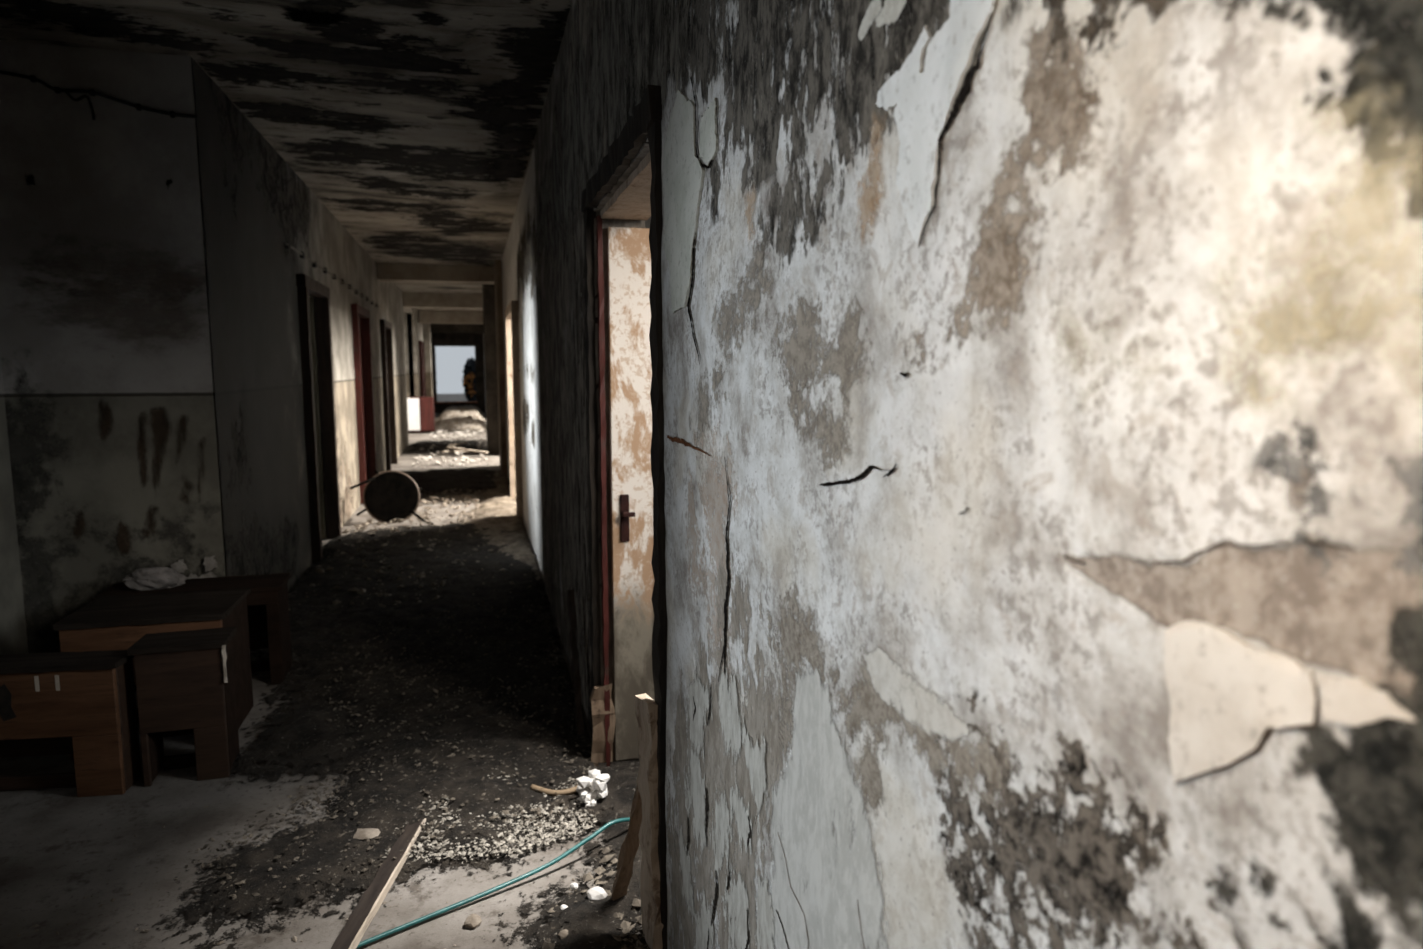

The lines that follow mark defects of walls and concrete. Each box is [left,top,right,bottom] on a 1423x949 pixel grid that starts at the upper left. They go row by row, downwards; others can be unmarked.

damp [0,0,571,267]
crack [690,77,718,169]
peeling [858,0,906,41]
peeling [875,0,996,247]
crack [918,3,995,248]
crack [687,232,700,365]
damp [5,373,209,653]
crack [820,464,897,487]
spalling [1288,461,1314,507]
damp [766,585,1206,949]
spalling [1066,540,1423,782]